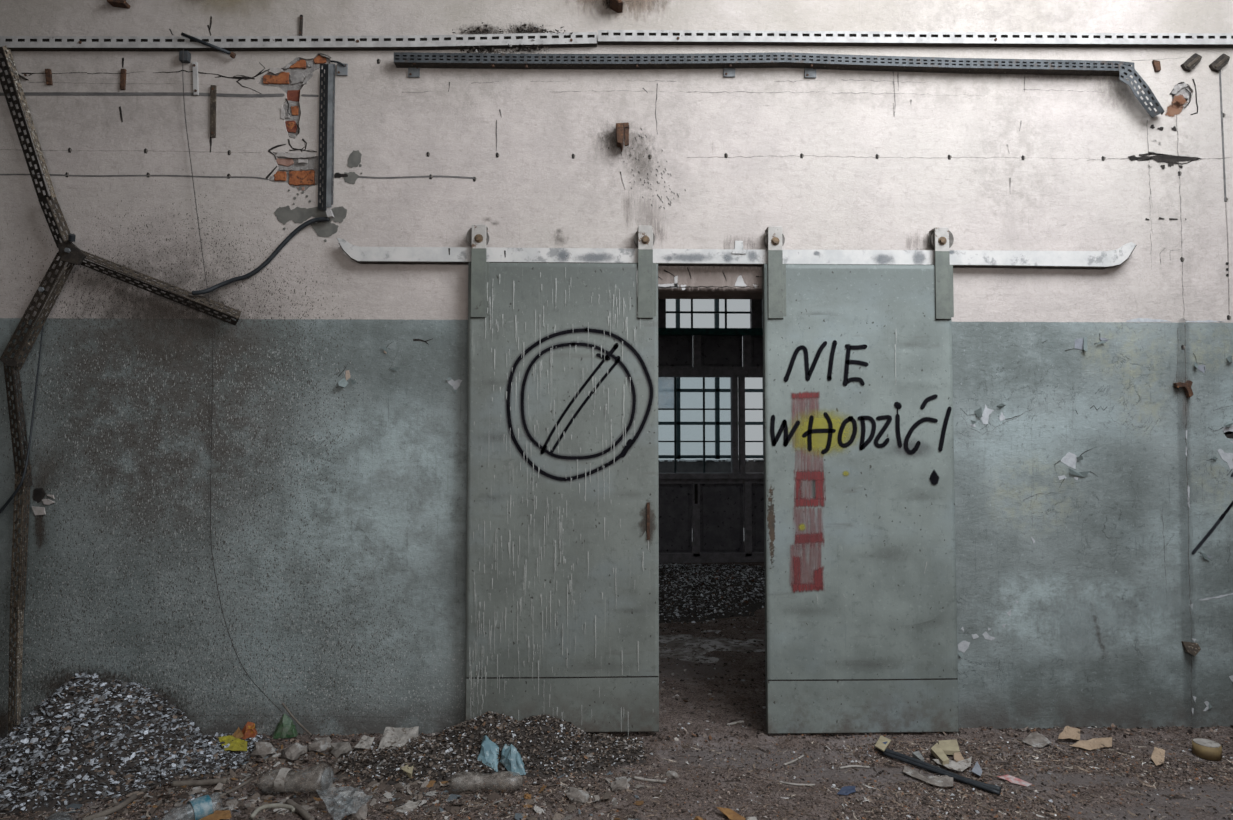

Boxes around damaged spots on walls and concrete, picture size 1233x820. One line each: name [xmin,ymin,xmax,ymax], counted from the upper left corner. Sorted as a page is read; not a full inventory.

flaking render [233,53,331,191]
flaking render [1165,79,1198,117]
peeling [1055,448,1094,488]
peeling [1207,421,1233,473]